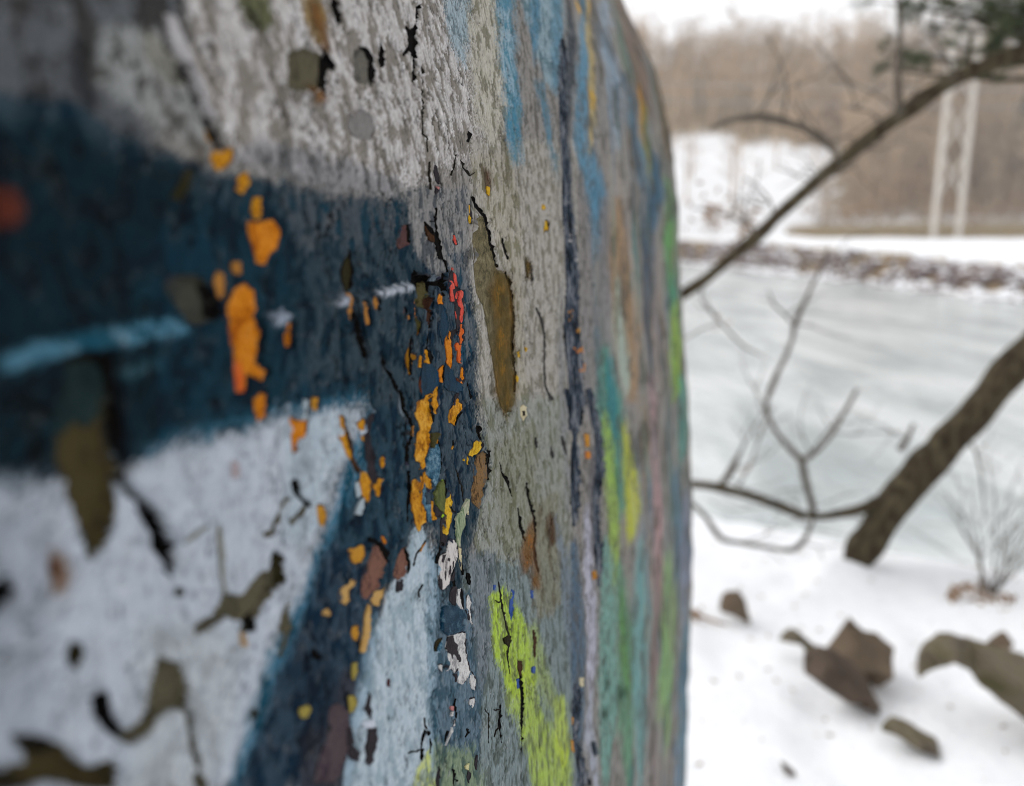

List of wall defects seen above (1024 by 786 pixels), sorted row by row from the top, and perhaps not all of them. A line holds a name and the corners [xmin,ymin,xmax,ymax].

spalling [353,47,377,90]
peeling [204,131,235,170]
spalling [346,110,377,140]
peeling [234,172,282,268]
spalling [396,224,411,249]
crack [378,4,607,586]
spalling [51,351,125,560]
peeling [316,504,328,526]
peeling [337,414,386,515]
spalling [403,204,528,708]
spalling [321,535,411,680]
crack [407,581,537,786]